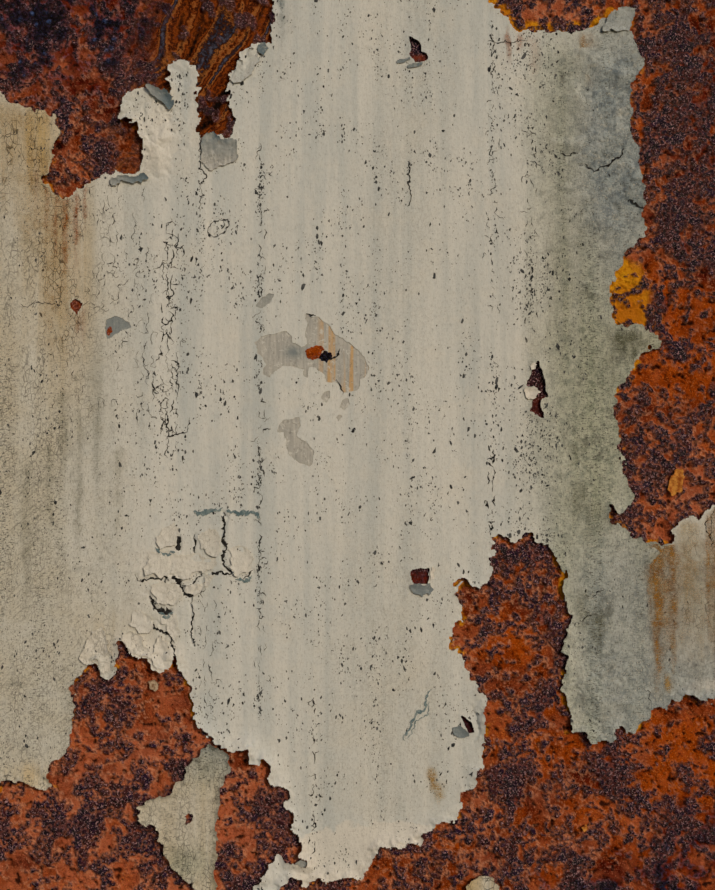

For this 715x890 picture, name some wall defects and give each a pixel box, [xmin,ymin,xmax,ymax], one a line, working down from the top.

peeling [0,0,275,199]
peeling [397,37,428,68]
peeling [70,299,82,315]
crack [21,183,191,456]
peeling [105,316,131,339]
peeling [255,314,369,421]
peeling [488,0,715,546]
peeling [277,417,314,466]
rust [651,544,676,668]
peeling [0,626,307,890]
peeling [280,532,715,890]